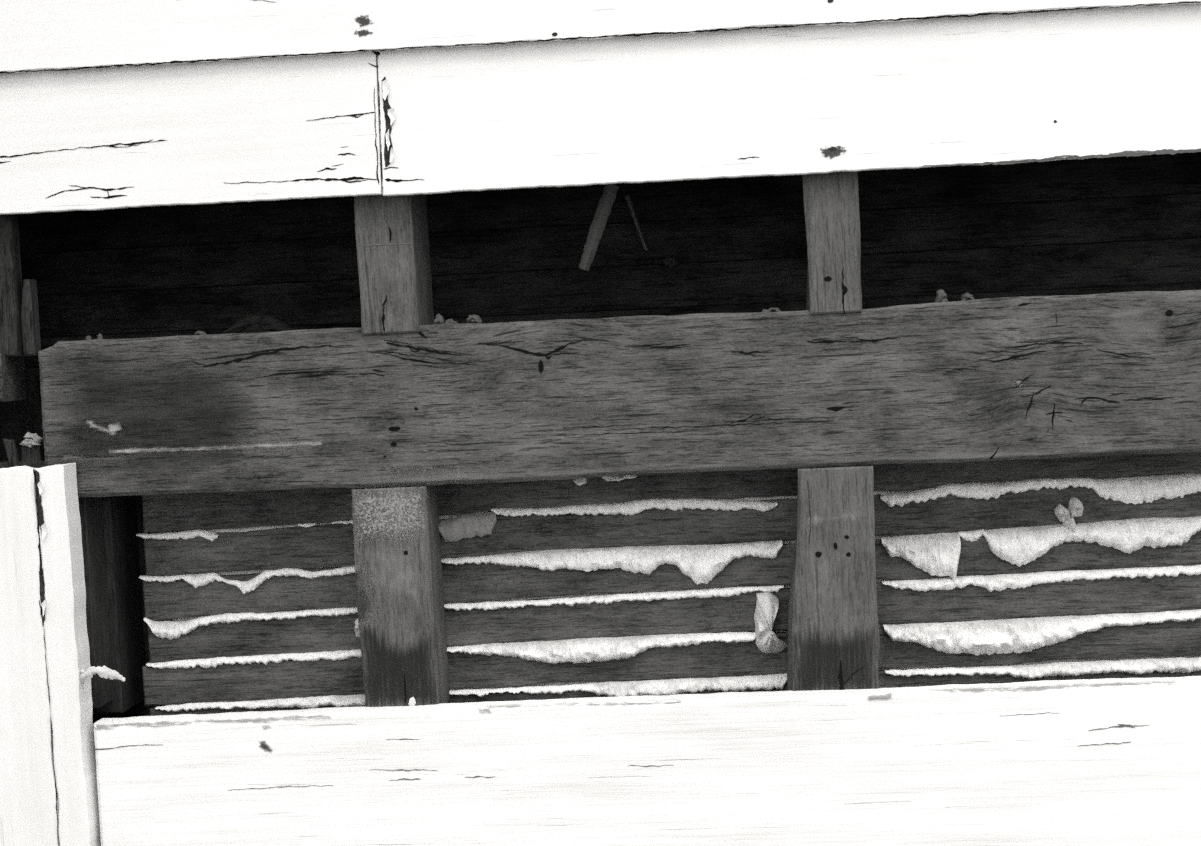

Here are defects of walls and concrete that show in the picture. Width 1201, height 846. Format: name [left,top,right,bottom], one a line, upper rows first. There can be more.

crack [191,331,592,379]
crack [945,315,1174,432]
crack [33,468,60,845]